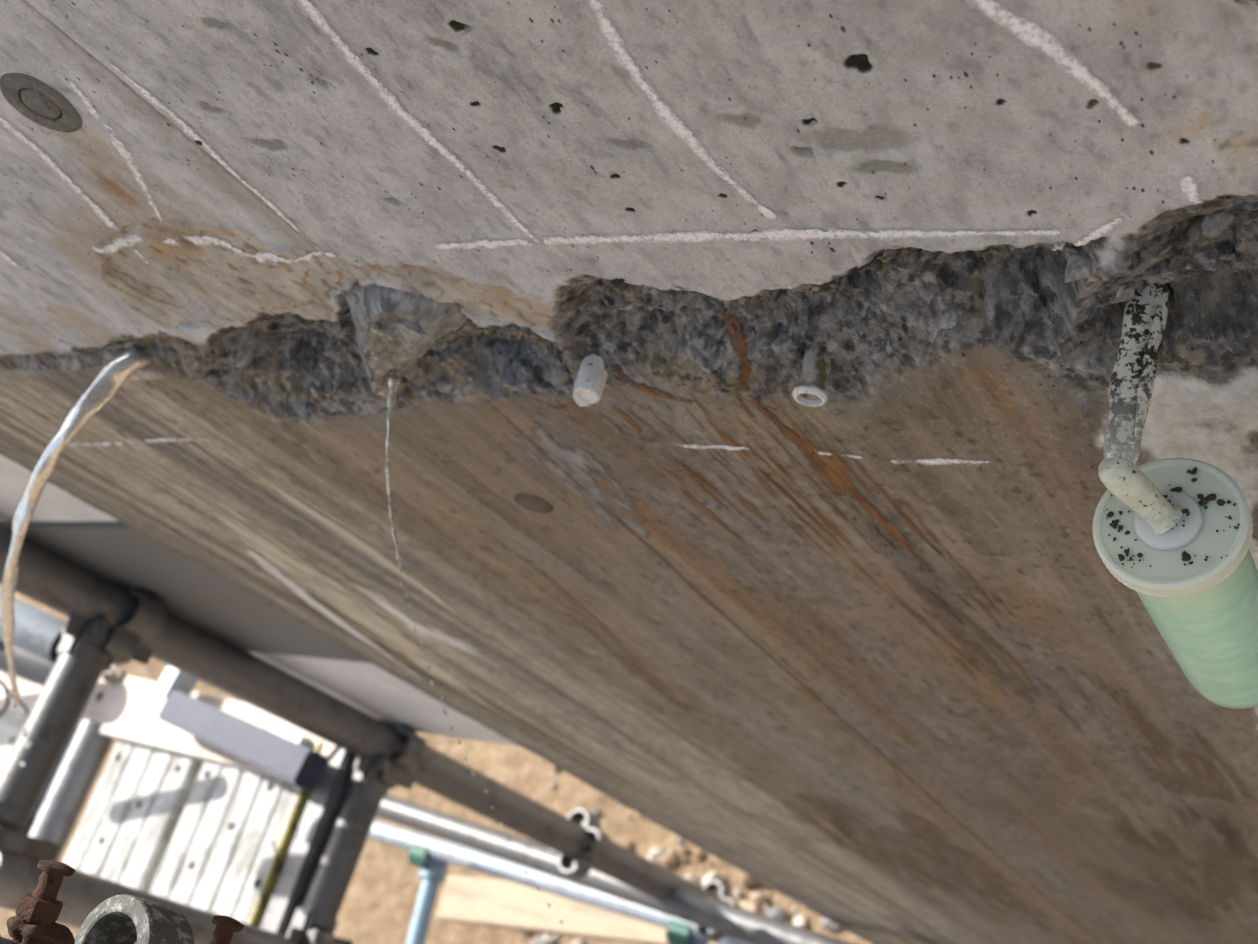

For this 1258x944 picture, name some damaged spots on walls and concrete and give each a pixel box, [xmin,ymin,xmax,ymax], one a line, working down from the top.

peeling [253,140,283,150]
spalling [95,195,1258,425]
corrosion [604,303,1002,629]
leakage [1096,415,1108,447]
leakage [1141,368,1258,512]
leakage [1249,538,1258,570]